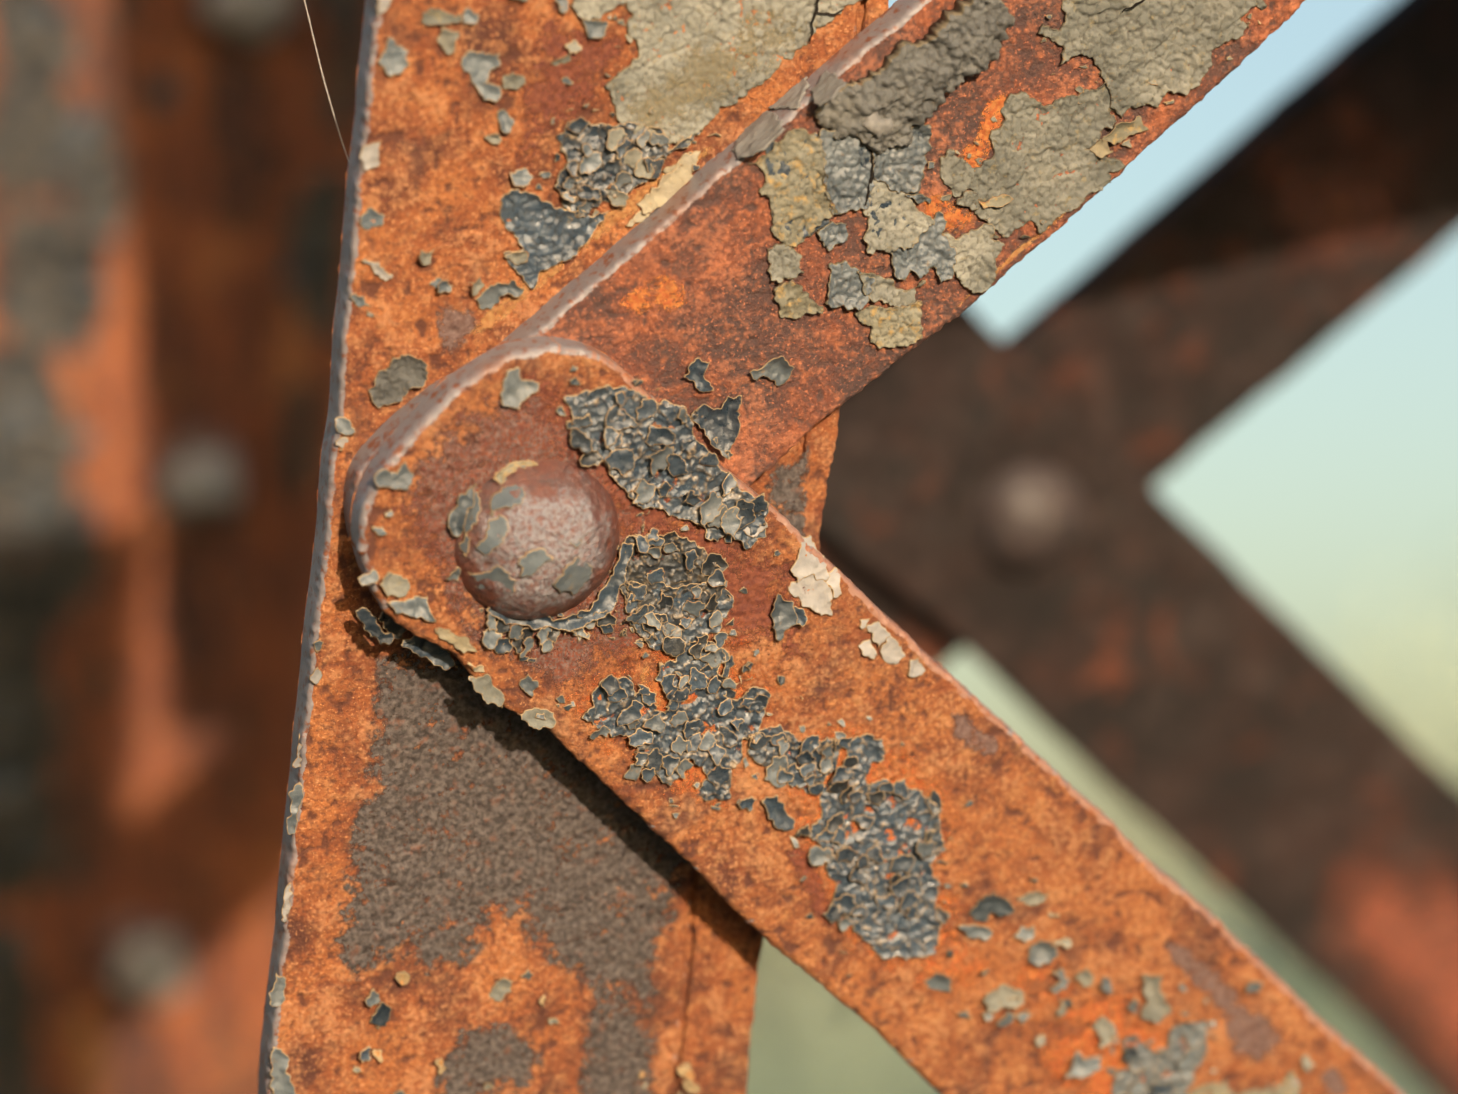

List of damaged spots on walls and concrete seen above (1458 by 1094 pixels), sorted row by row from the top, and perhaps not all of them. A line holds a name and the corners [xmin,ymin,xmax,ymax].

peeling [314,0,392,134]
rust [516,18,624,168]
peeling [419,0,1015,349]
rust [923,195,972,231]
rust [962,95,1008,168]
rust [471,262,563,334]
rust [620,276,687,314]
rust [392,371,813,721]
peeling [356,354,1114,1018]
peeling [352,988,392,1073]
peeling [957,969,1032,1028]
peeling [1064,974,1218,1094]